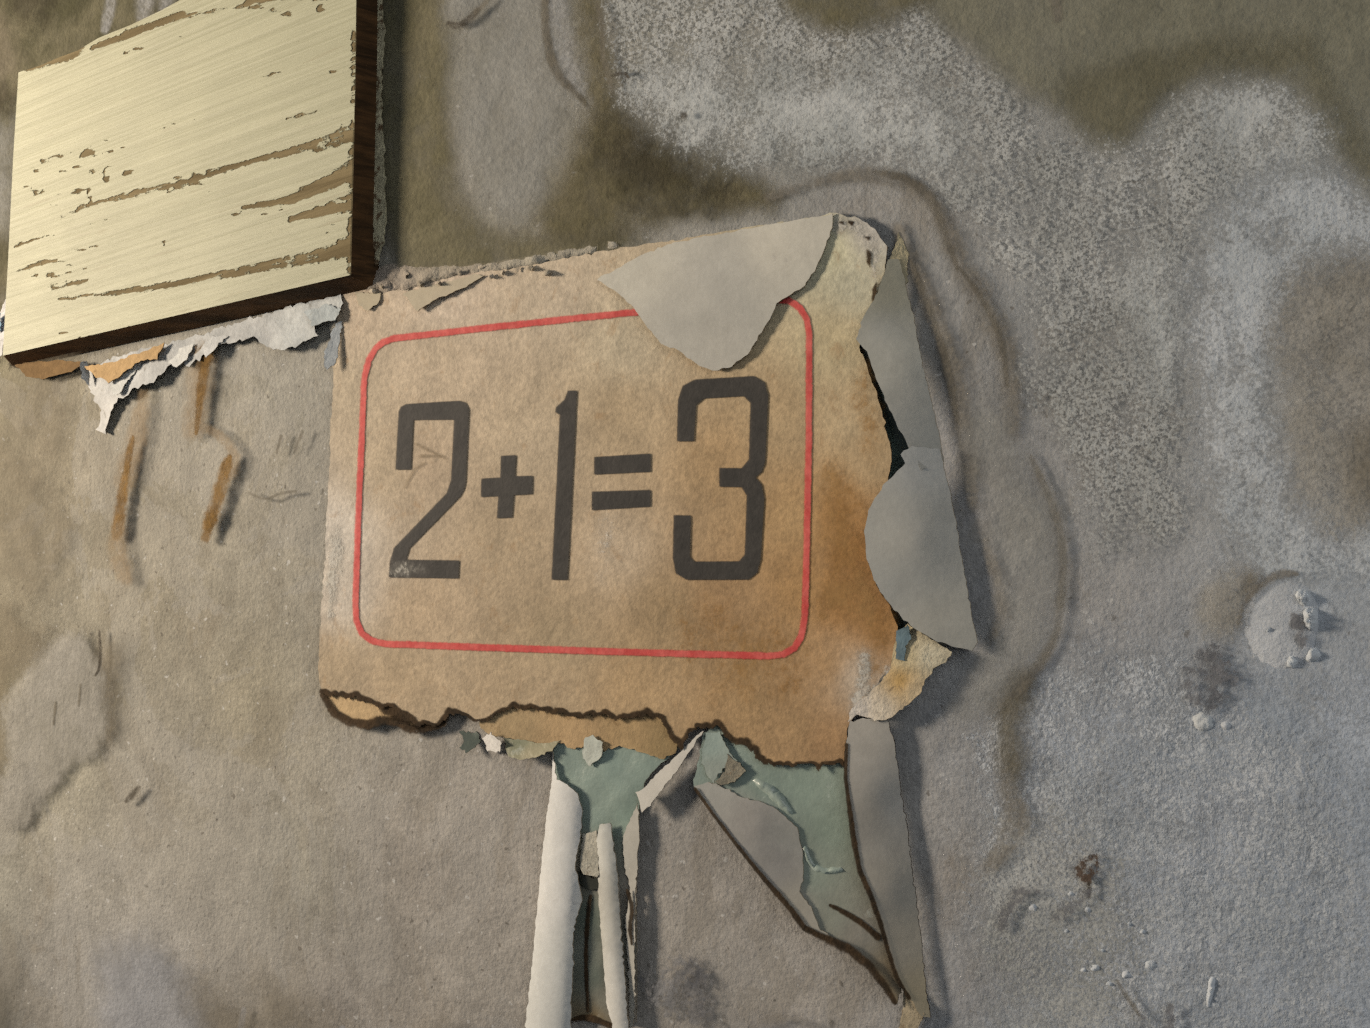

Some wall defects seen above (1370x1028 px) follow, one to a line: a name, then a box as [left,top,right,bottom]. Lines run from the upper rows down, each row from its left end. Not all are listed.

rust [195,348,213,435]
peeling [80,292,381,434]
rust [112,436,134,540]
rust [201,454,232,542]
water stain [381,0,1370,1028]